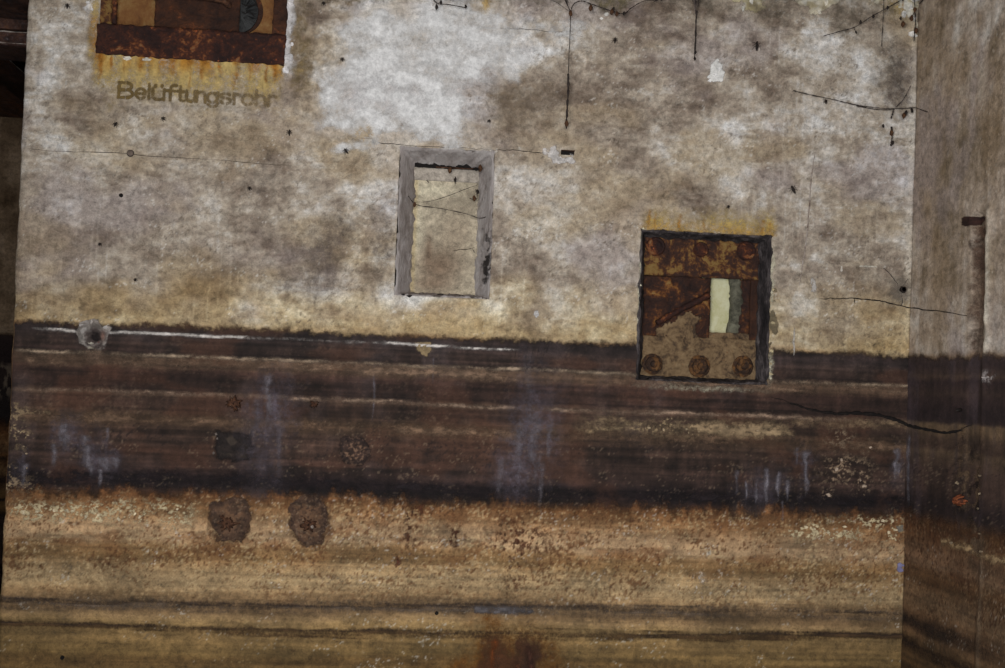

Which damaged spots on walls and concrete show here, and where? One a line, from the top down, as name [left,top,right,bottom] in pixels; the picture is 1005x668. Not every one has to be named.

rust [89,0,282,97]
rust [644,215,776,236]
crack [827,269,967,316]
leakage [0,319,1005,544]
crack [771,397,971,434]
leakage [941,539,1005,564]
rust [452,617,558,668]